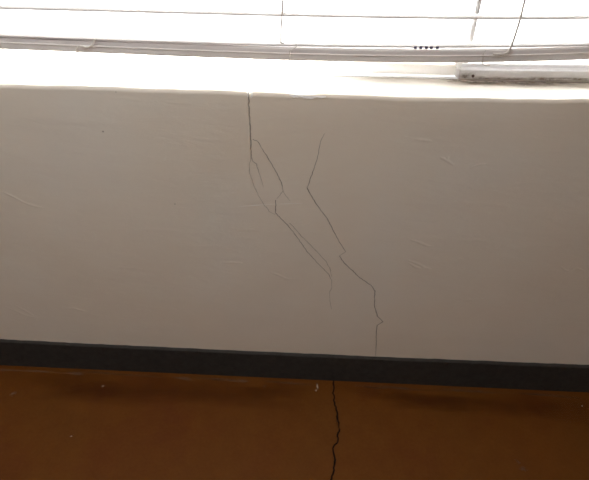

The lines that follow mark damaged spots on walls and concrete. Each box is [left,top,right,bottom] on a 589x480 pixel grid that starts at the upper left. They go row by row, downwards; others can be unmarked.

crack [247,92,282,184]
crack [330,381,340,480]